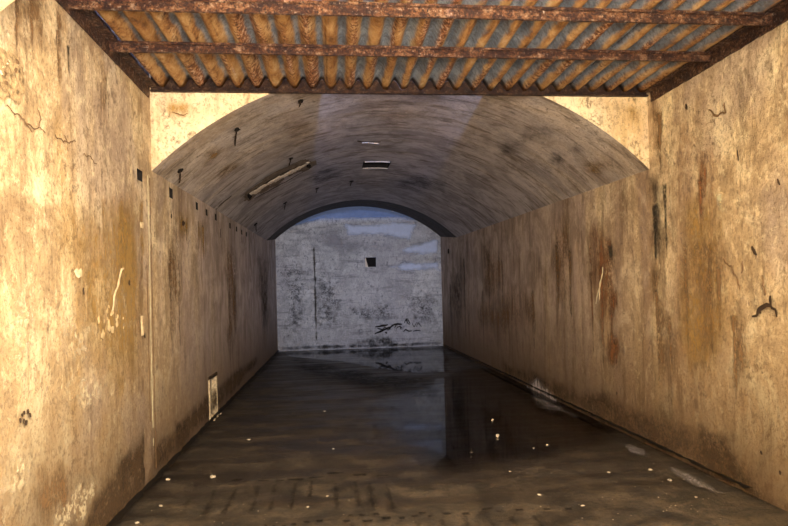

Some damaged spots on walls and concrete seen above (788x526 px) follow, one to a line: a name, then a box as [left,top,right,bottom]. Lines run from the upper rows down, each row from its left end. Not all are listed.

crack [6,105,97,164]
leakage [652,182,667,258]
flaking render [98,268,130,341]
corrosion [589,229,619,363]
leakage [37,359,257,526]